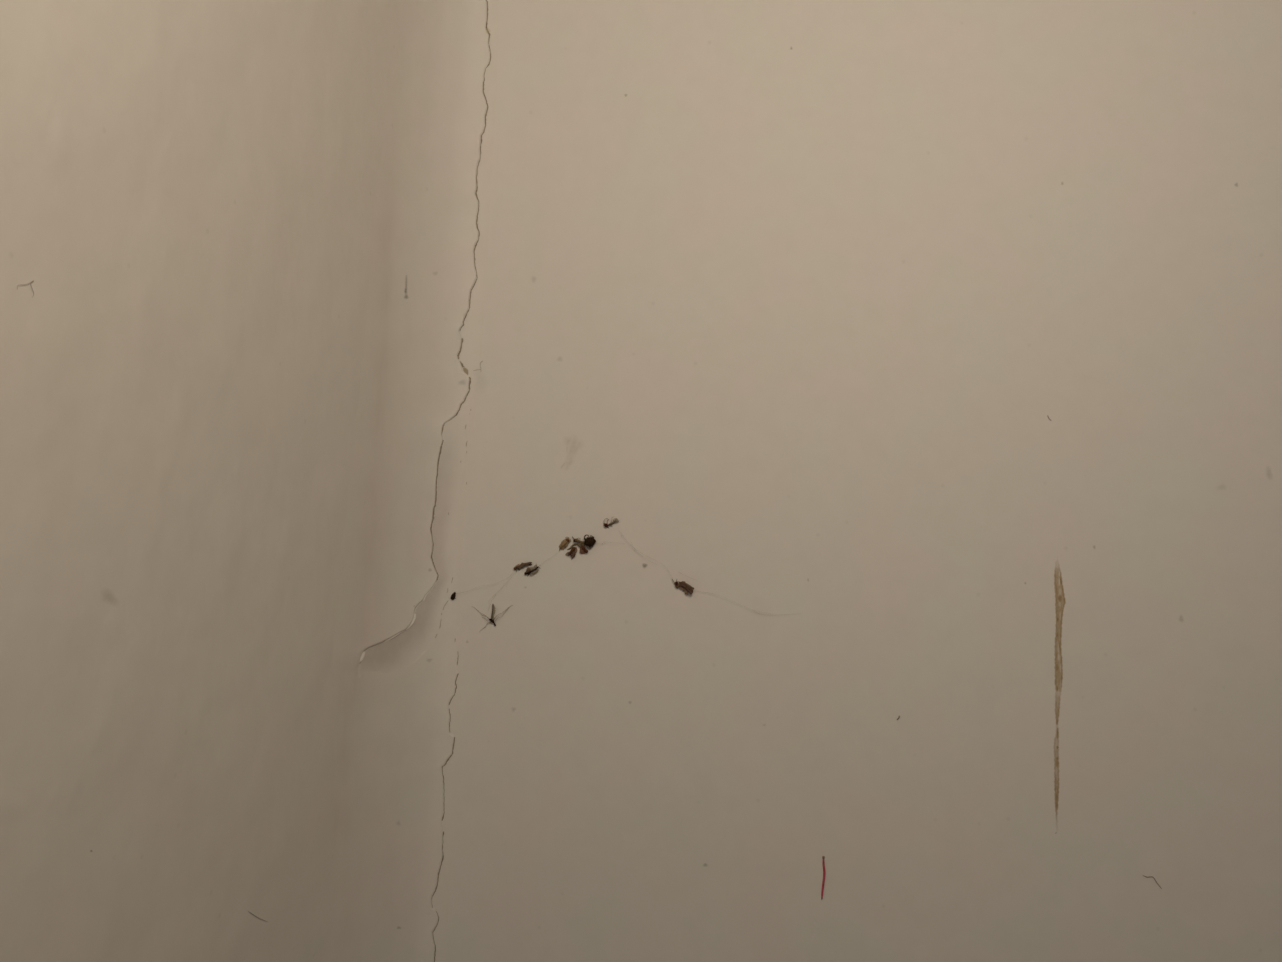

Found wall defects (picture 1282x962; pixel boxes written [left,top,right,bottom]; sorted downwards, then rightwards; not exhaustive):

crack [430,0,491,962]